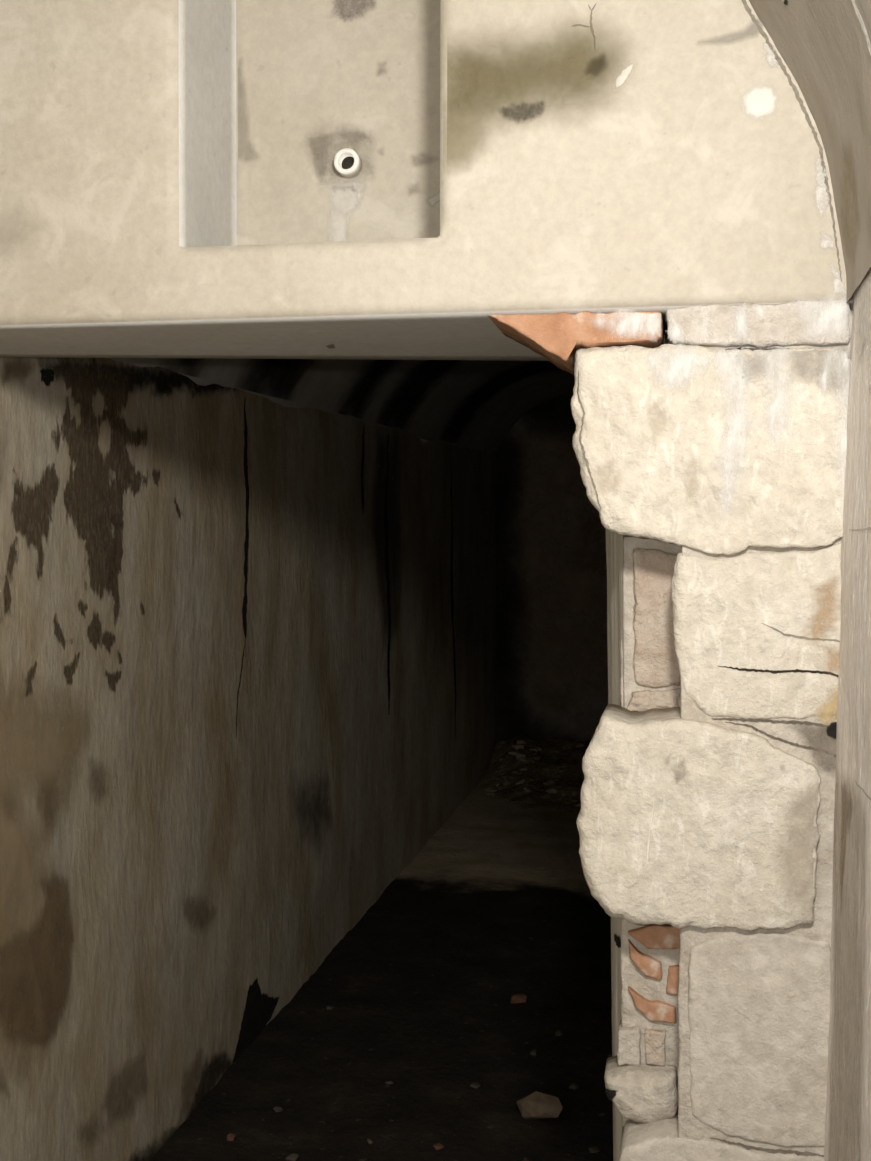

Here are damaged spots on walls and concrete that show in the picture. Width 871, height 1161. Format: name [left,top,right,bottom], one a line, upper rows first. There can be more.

rust [336,0,373,18]
damp [447,36,608,147]
damp [312,135,363,242]
peeling [0,360,160,692]
crack [762,623,840,642]
crack [719,666,839,678]
crack [711,718,830,750]
crack [712,1138,824,1157]